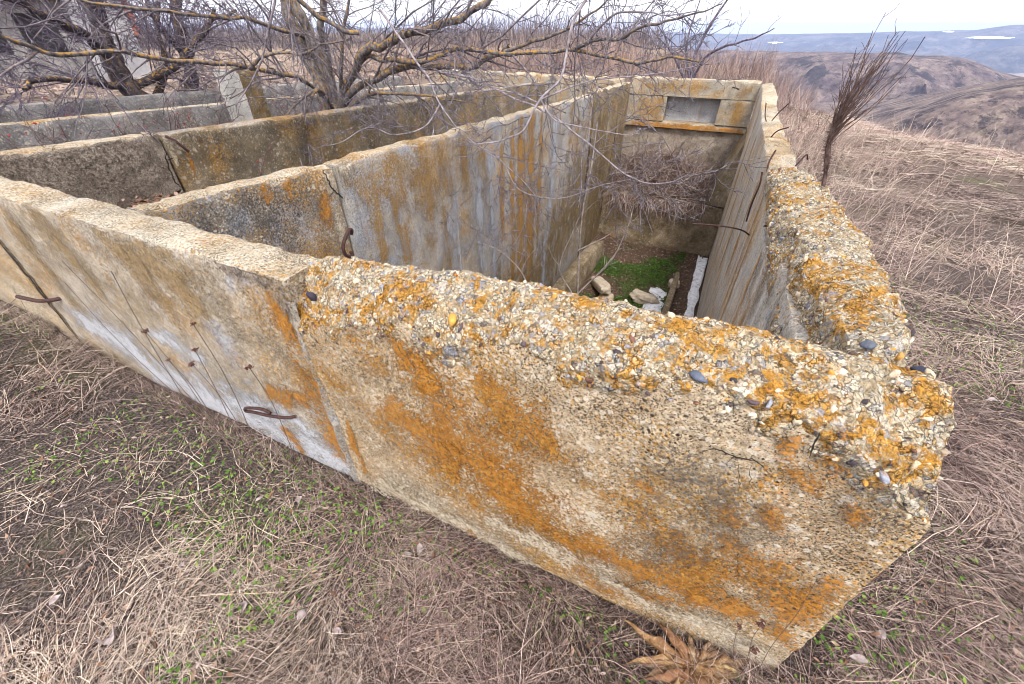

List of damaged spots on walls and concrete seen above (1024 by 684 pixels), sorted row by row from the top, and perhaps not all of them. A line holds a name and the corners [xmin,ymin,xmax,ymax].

crack [162,141,181,187]
rust [343,113,543,282]
rust [2,214,82,312]
rust [26,208,112,307]
rust [86,226,213,323]
spalling [216,162,957,520]
rust [263,282,855,651]
crack [700,448,772,492]